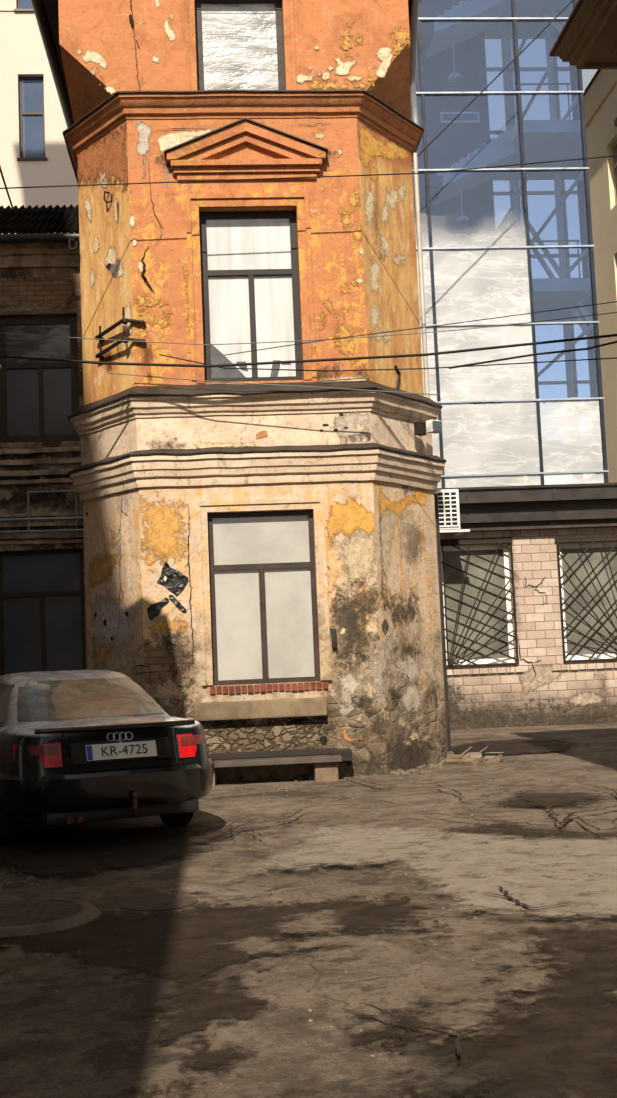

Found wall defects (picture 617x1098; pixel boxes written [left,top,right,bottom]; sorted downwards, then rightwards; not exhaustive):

peeling [76,48,121,95]
crack [130,0,140,91]
peeling [296,16,410,90]
peeling [77,120,213,246]
crack [141,161,164,292]
peeling [317,127,410,382]
peeling [325,485,426,590]
damp [156,619,197,707]
damp [330,578,420,676]
crack [525,577,548,606]
damp [201,710,334,749]
damp [342,696,432,776]